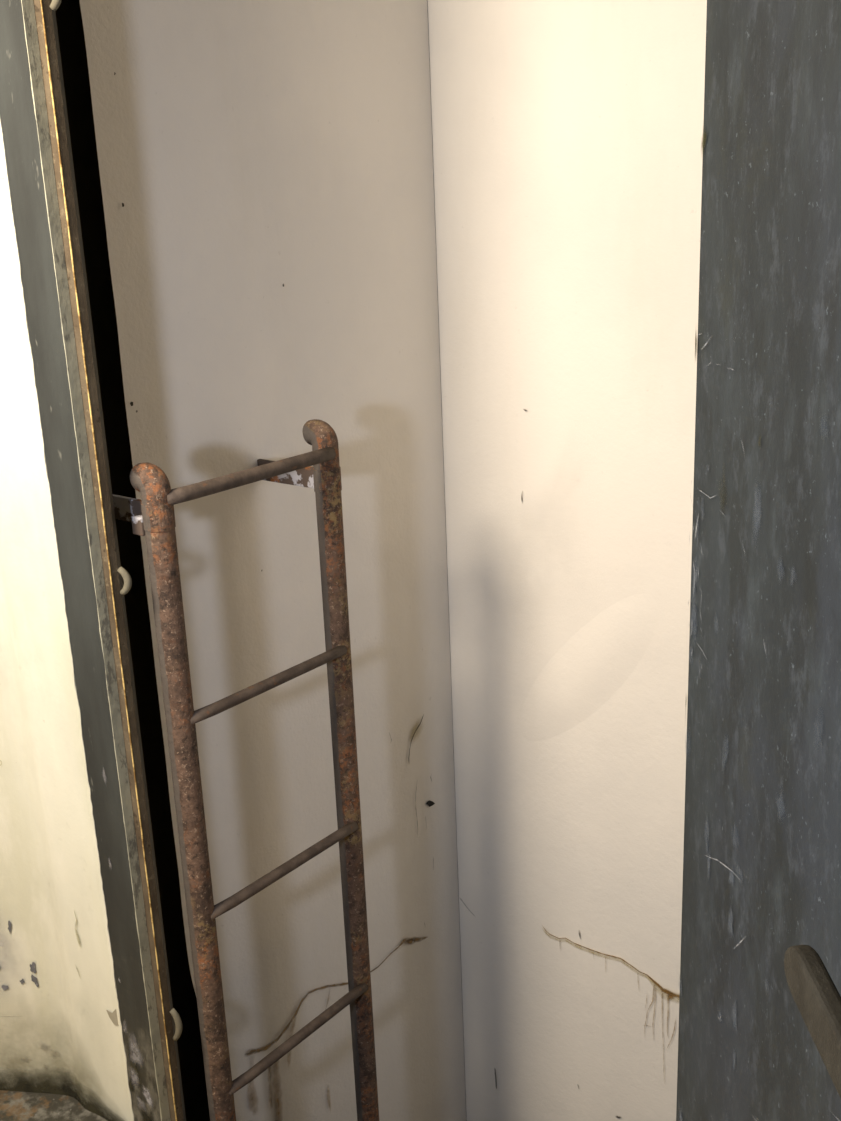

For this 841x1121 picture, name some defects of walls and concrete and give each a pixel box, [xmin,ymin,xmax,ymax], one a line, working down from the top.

peeling [2,962,39,990]
crack [247,923,426,1121]
crack [543,927,680,1060]
water stain [0,1058,120,1121]